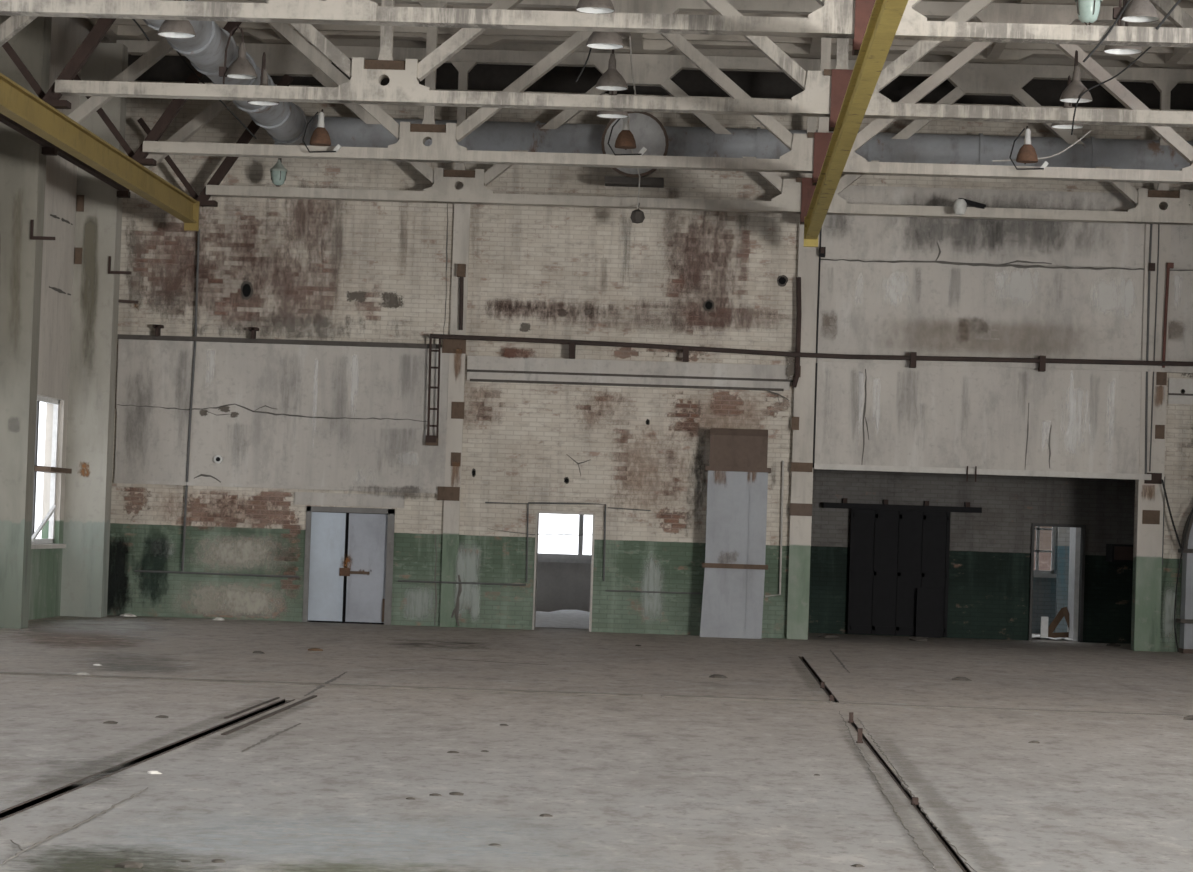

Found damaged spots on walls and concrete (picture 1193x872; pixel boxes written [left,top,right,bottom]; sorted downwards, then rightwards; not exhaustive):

peeling [133,223,259,321]
peeling [669,229,728,332]
peeling [738,230,749,295]
peeling [667,392,743,435]
peeling [124,487,150,518]
peeling [657,477,689,534]
damp [107,536,168,614]
peeling [186,492,301,620]